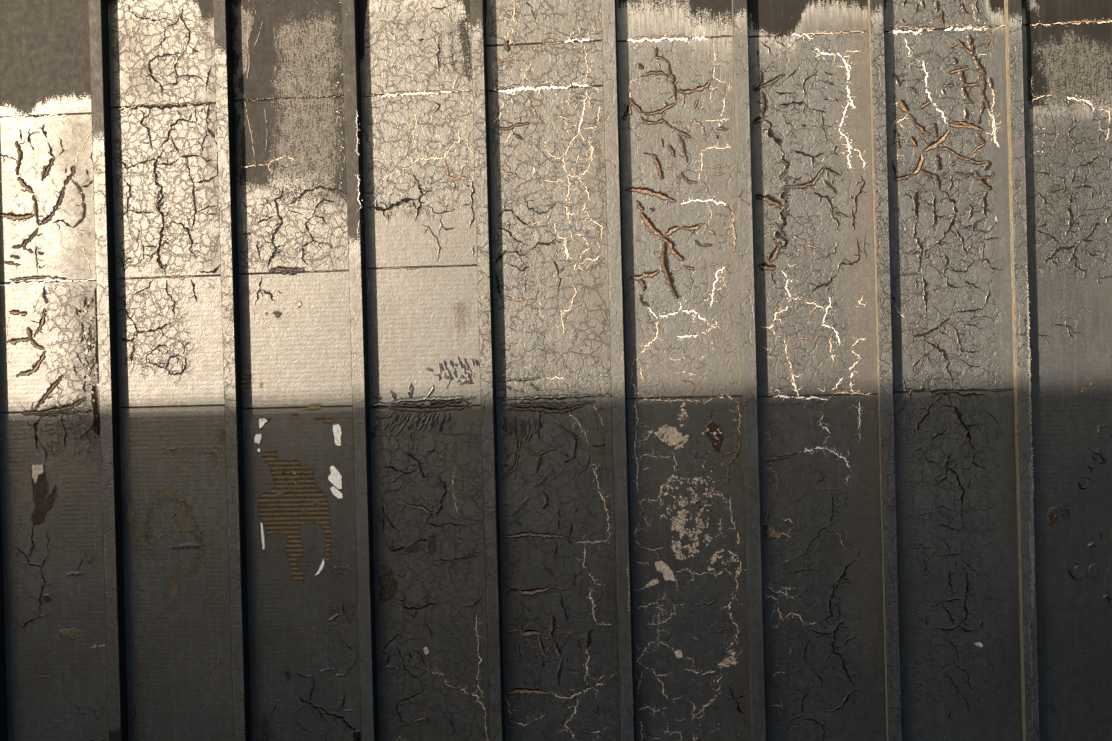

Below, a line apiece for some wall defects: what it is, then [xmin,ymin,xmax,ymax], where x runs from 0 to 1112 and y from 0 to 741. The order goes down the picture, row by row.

crack [905,39,952,124]
crack [972,0,988,22]
crack [0,0,603,376]
crack [1029,78,1112,286]
peeling [29,463,57,526]
peeling [253,417,344,583]
peeling [284,402,343,447]
crack [269,32,869,741]
crack [892,170,1007,719]
crack [1038,321,1081,344]